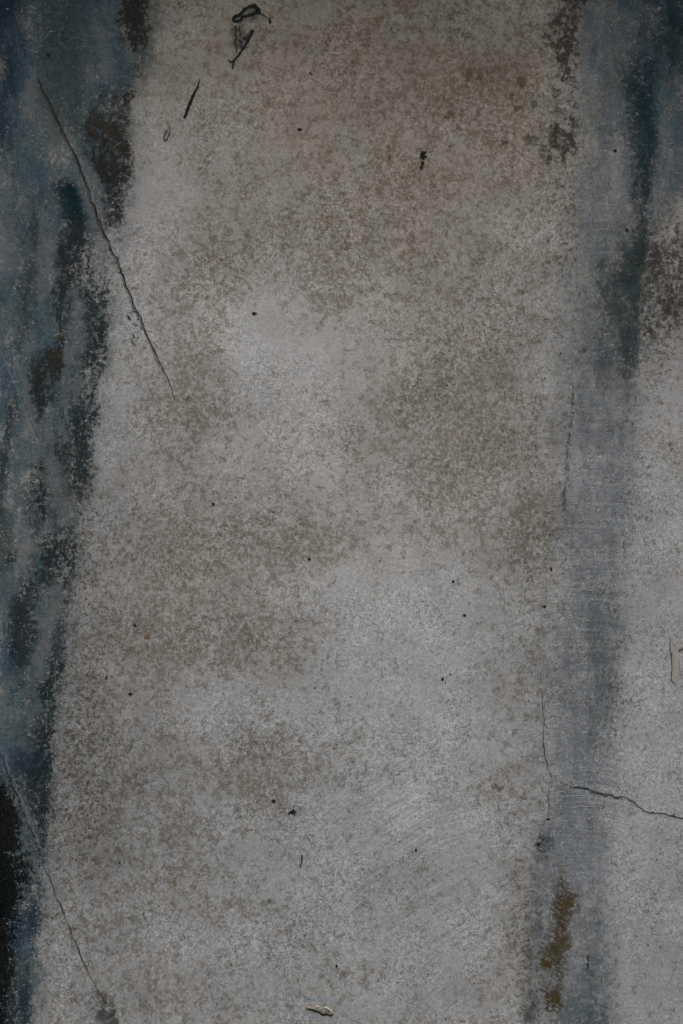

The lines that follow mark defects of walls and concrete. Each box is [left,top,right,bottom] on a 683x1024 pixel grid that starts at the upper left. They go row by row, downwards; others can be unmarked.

crack [38,80,175,400]
water stain [0,0,159,1024]
water stain [526,0,683,1024]
crack [539,688,683,852]
corrosion [541,866,580,1013]